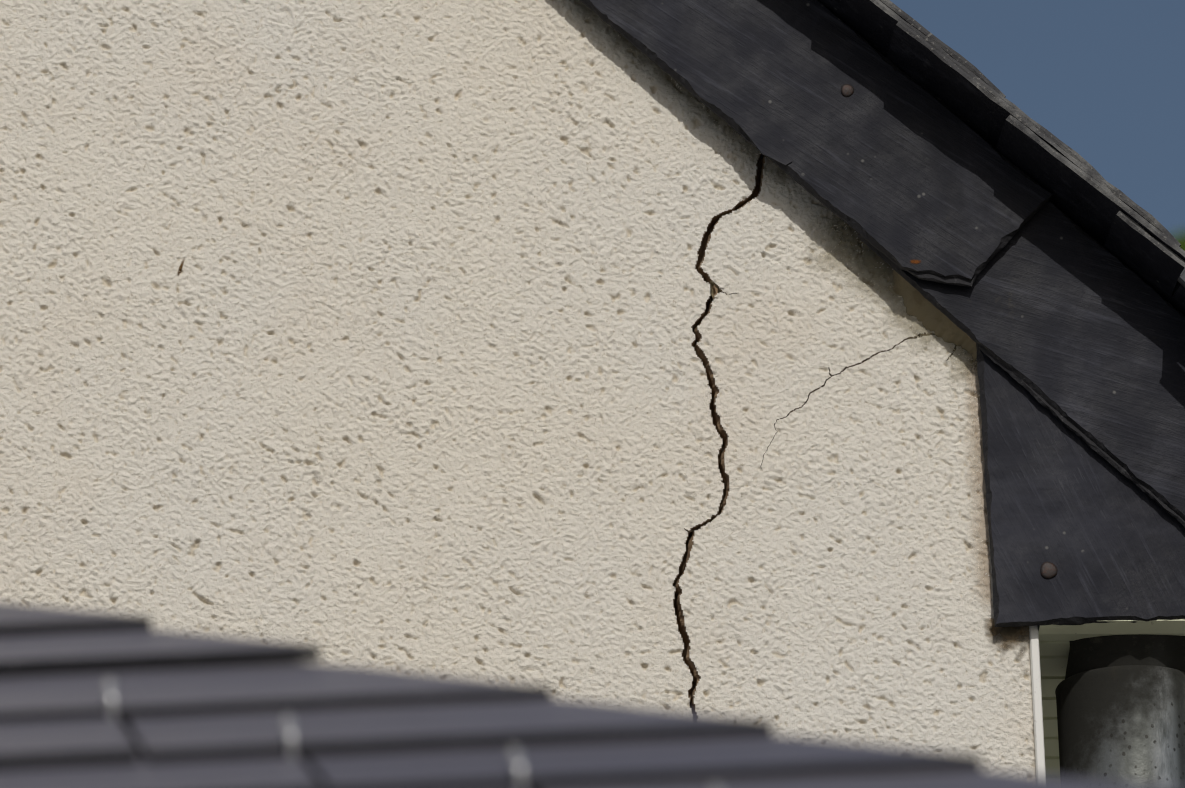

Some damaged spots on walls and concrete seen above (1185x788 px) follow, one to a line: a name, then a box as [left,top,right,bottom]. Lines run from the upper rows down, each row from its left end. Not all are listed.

crack [673,154,766,714]
crack [761,332,957,465]